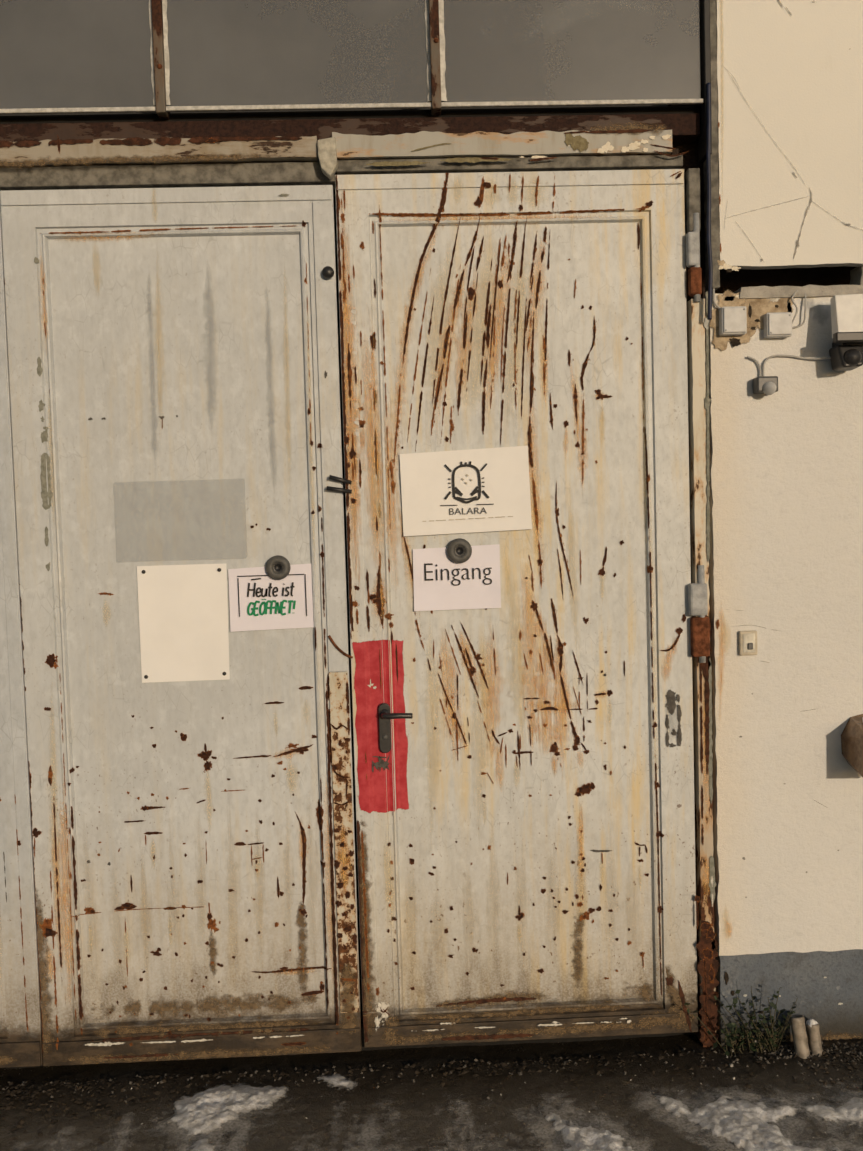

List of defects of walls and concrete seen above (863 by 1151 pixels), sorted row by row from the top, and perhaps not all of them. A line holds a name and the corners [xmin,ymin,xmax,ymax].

peeling [564,131,671,154]
crack [792,172,812,259]
rust [336,175,390,639]
rust [369,173,624,770]
peeling [643,414,682,747]
spalling [704,260,856,562]
rust [28,761,59,1054]
rust [70,683,368,1064]
rust [398,894,719,1046]
rust [575,782,595,797]
peeling [592,884,645,970]
peeling [634,755,664,995]